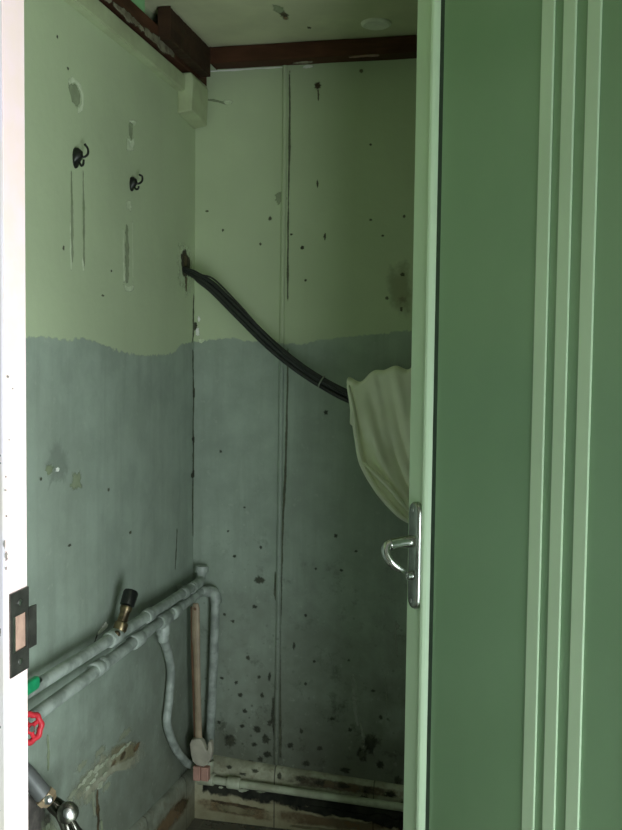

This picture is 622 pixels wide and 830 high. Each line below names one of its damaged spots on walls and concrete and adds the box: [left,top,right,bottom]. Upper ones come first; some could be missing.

water stain [249,721,272,761]
peeling [68,728,139,816]
water stain [203,784,403,830]